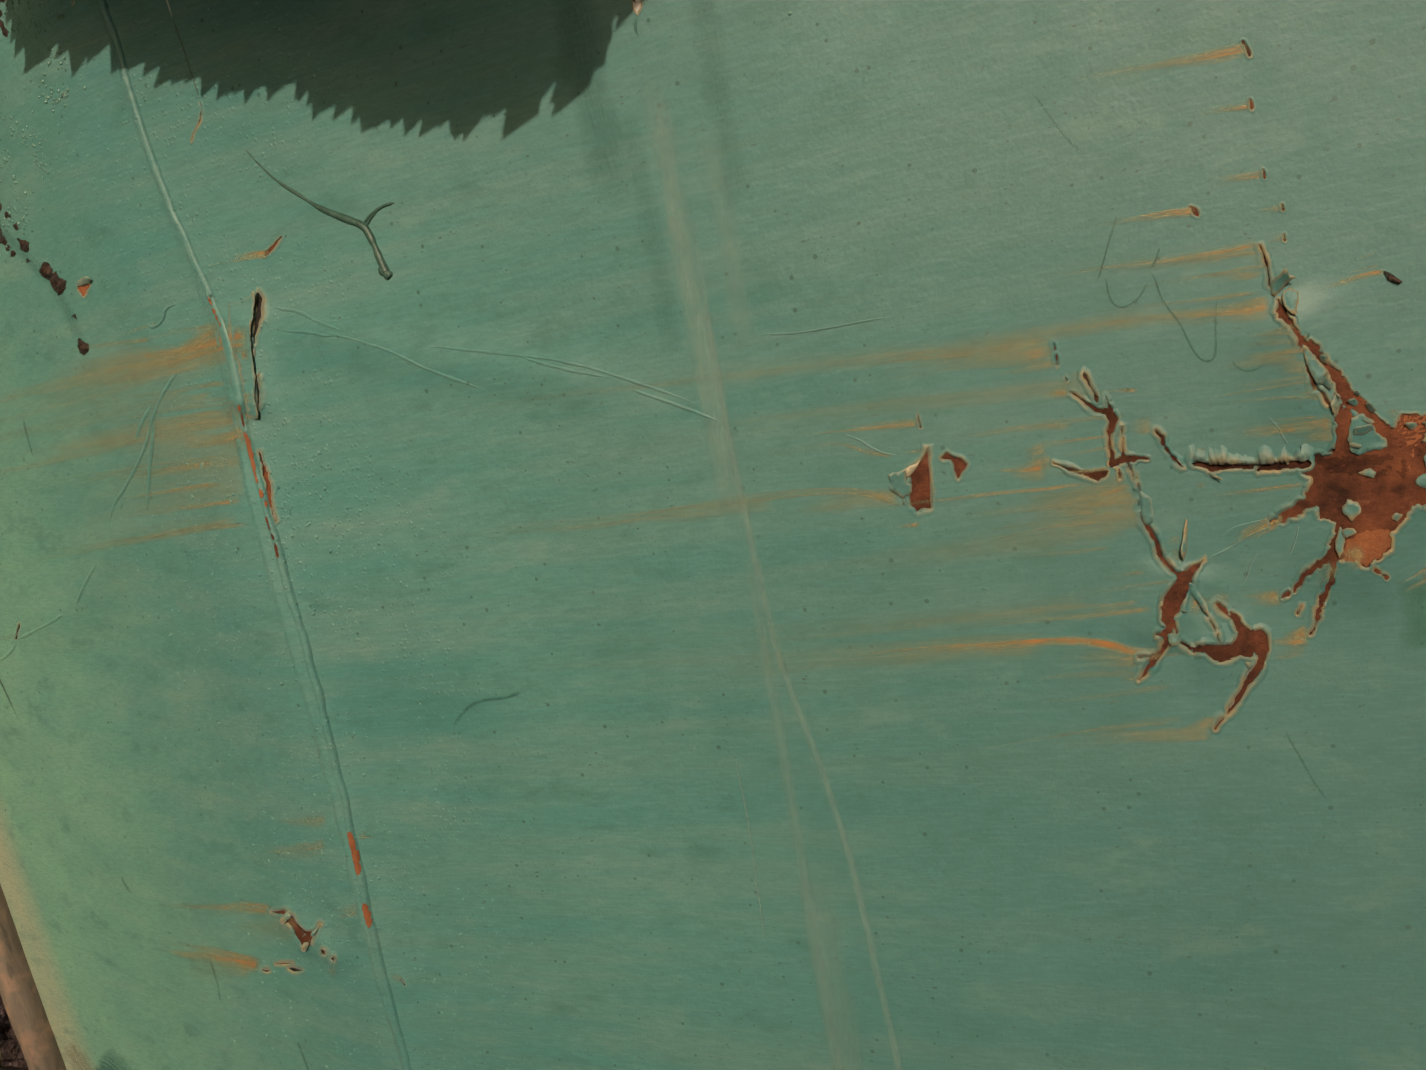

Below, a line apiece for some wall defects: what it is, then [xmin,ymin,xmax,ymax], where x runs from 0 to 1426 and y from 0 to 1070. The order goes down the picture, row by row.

corrosion [0,0,9,37]
corrosion [0,203,67,296]
corrosion [77,338,89,356]
corrosion [128,297,245,367]
corrosion [176,395,282,558]
peeling [844,411,971,526]
corrosion [347,832,364,875]
peeling [204,903,340,977]
corrosion [362,903,373,928]